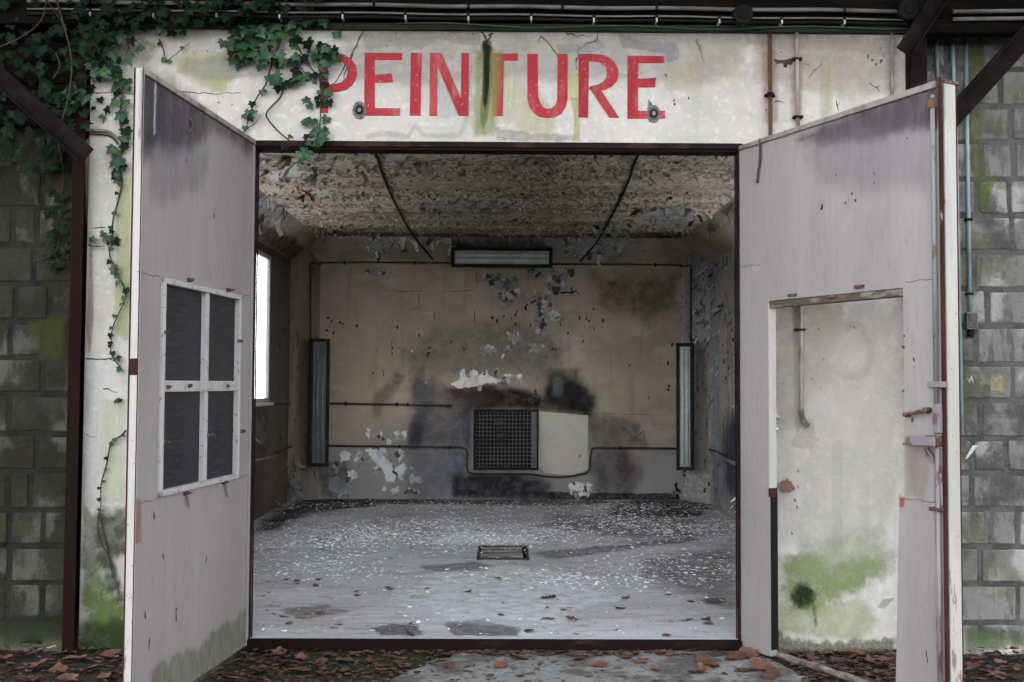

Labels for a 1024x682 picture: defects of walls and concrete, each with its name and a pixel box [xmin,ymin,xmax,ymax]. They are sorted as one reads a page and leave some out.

peeling [257,153,734,391]
peeling [329,428,422,499]
water stain [260,374,735,636]
peeling [568,454,593,500]
water stain [83,510,125,591]
water stain [791,585,817,626]